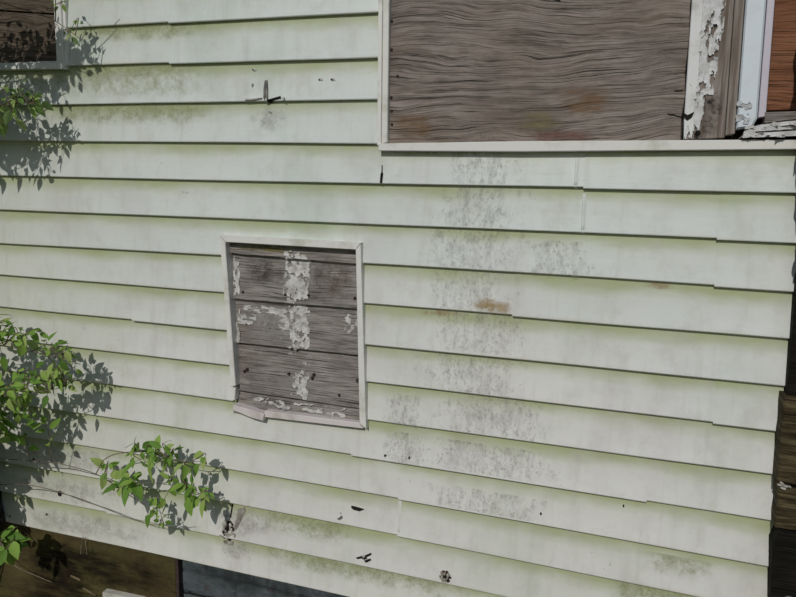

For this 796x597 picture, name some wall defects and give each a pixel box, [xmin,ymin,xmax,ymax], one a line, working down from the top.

peeling [684,0,726,139]
peeling [735,101,796,138]
peeling [236,251,346,418]
peeling [344,312,357,334]